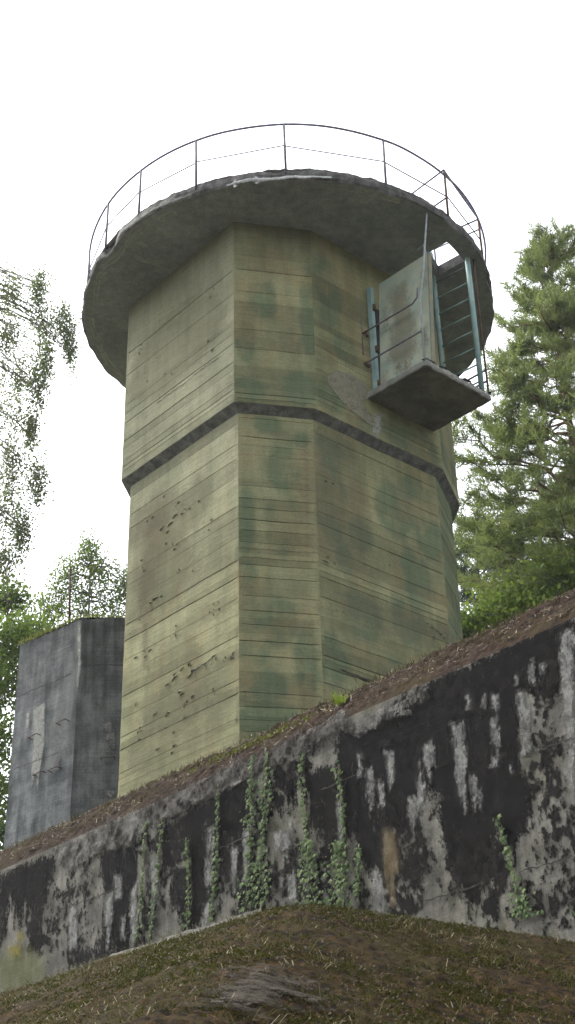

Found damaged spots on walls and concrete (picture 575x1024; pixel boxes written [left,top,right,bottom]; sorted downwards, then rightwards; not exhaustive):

water stain [0,618,575,970]